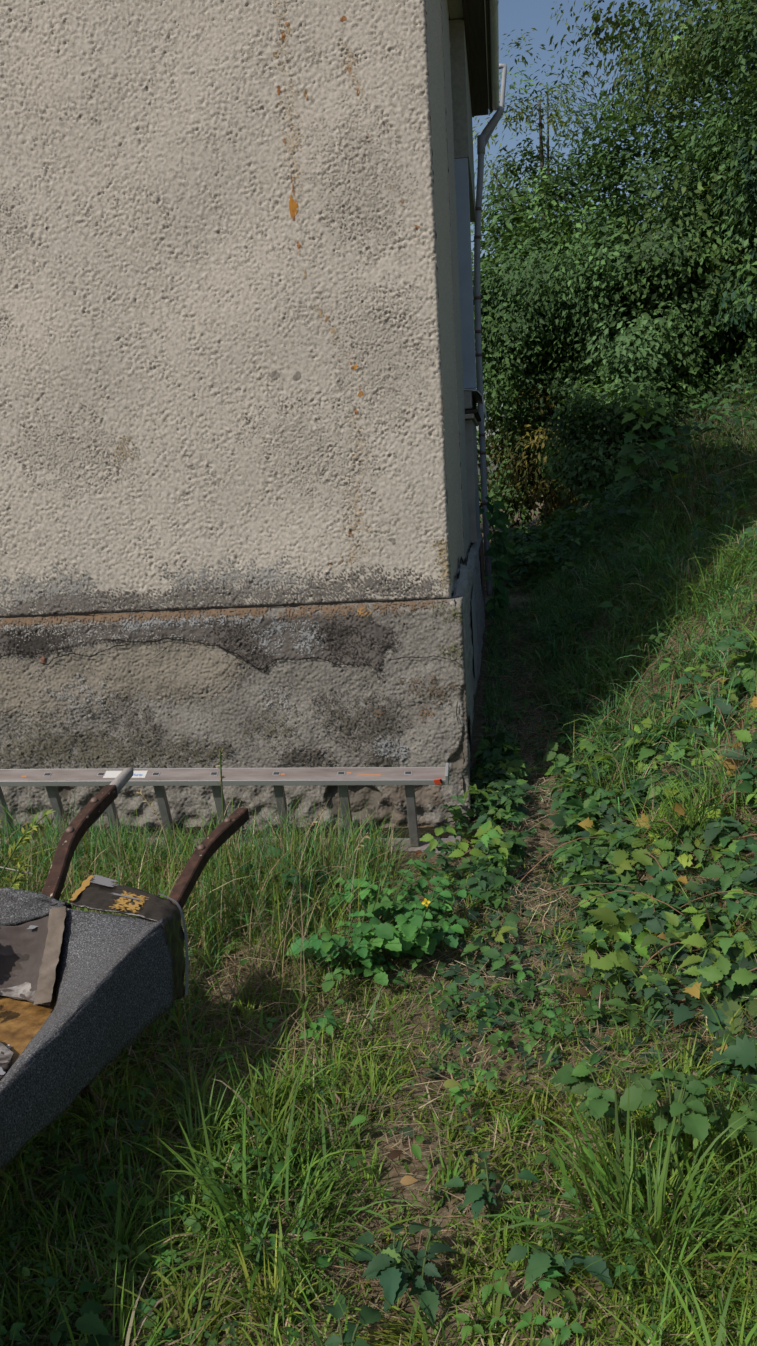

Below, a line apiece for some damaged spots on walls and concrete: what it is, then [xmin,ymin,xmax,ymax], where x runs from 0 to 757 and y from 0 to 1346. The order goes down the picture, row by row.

rust [272,0,308,220]
crack [0,541,473,671]
damp [0,538,477,769]